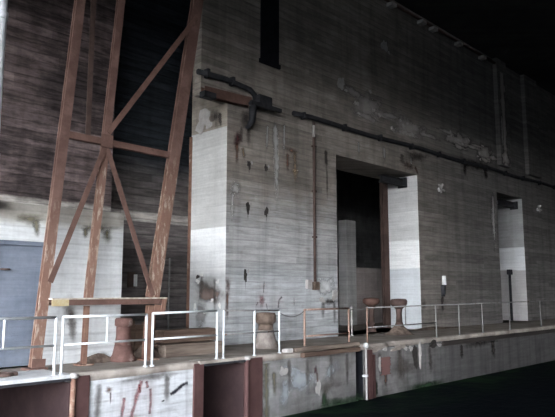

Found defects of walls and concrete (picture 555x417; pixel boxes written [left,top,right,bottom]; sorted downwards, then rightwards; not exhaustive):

peeling [195,108,213,135]
peeling [337,78,435,139]
peeling [439,129,497,162]
peeling [279,366,307,388]